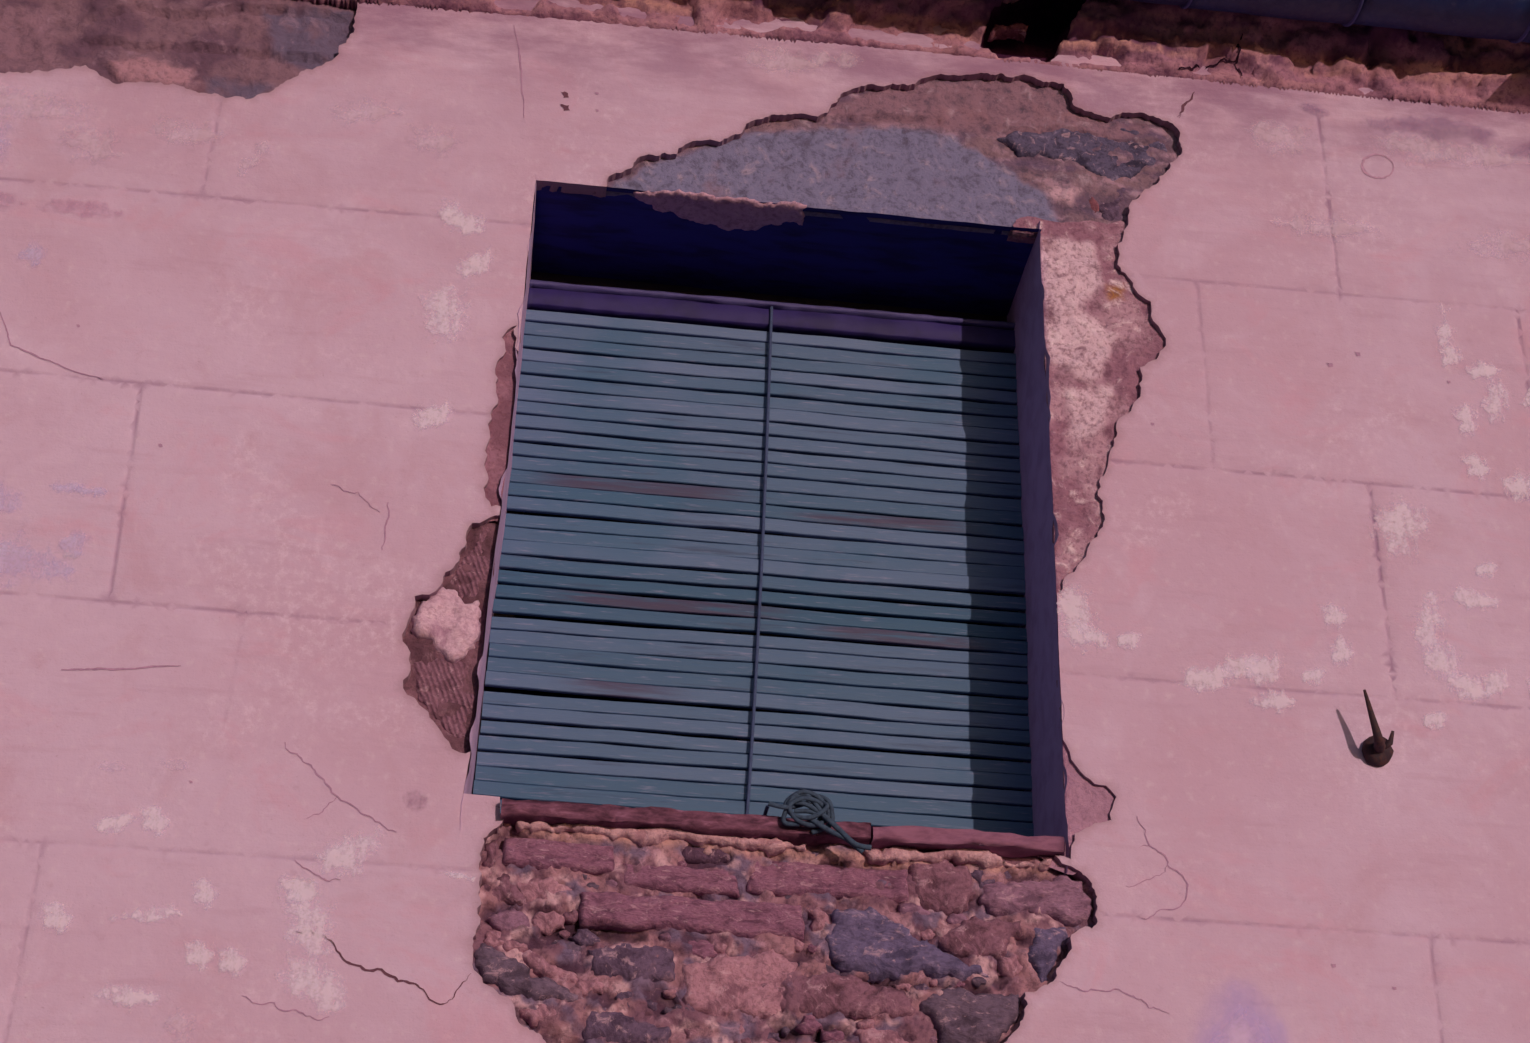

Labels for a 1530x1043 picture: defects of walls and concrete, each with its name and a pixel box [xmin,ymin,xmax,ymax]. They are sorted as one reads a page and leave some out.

flaking render [0,0,356,99]
spalling [988,23,1028,43]
flaking render [593,78,1180,648]
flaking render [403,319,522,773]
crack [285,743,396,832]
flaking render [450,741,1115,1043]
crack [1127,817,1189,920]
crack [295,931,470,1005]